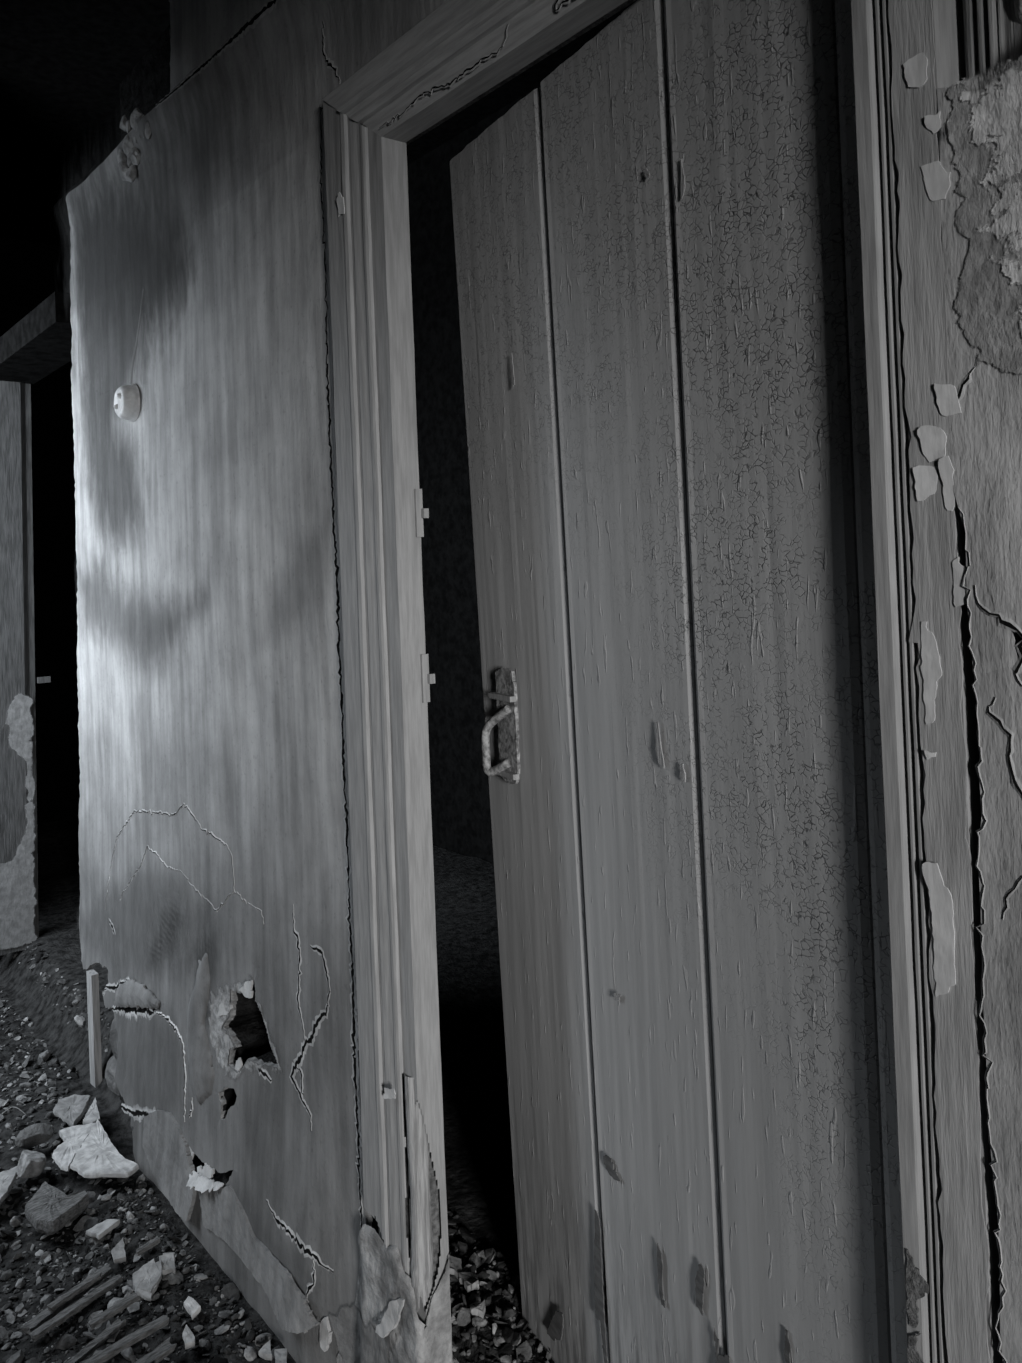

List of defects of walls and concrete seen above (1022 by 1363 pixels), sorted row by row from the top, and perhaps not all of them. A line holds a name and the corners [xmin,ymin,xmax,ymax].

crack [379,23,509,129]
peeling [903,53,928,88]
peeling [921,56,1022,375]
peeling [913,384,962,511]
crack [256,21,364,1228]
peeling [0,693,37,949]
crack [103,977,157,1022]
crack [121,1103,156,1123]
spalling [208,975,281,1120]
crack [959,508,1022,1363]
crack [266,1199,333,1304]
spalling [319,1209,452,1363]